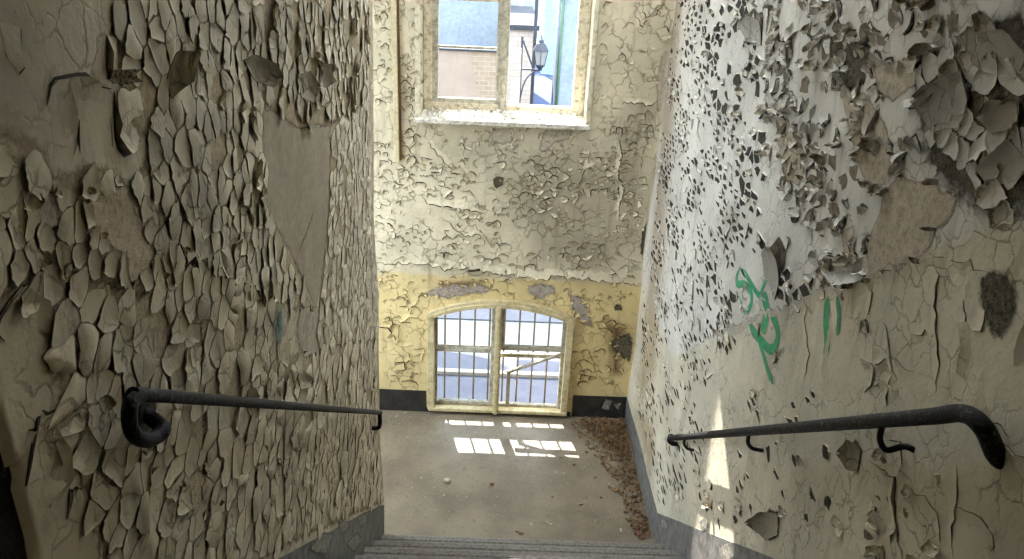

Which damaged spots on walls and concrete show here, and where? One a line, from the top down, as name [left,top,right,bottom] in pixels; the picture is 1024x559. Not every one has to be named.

peeling [0,0,653,559]
crack [389,304,423,380]
spalling [637,0,1024,540]
crack [692,220,1024,411]
crack [1004,444,1024,474]
peeling [718,543,735,559]
crack [868,460,911,559]
spalling [863,484,940,559]
crack [946,466,958,559]